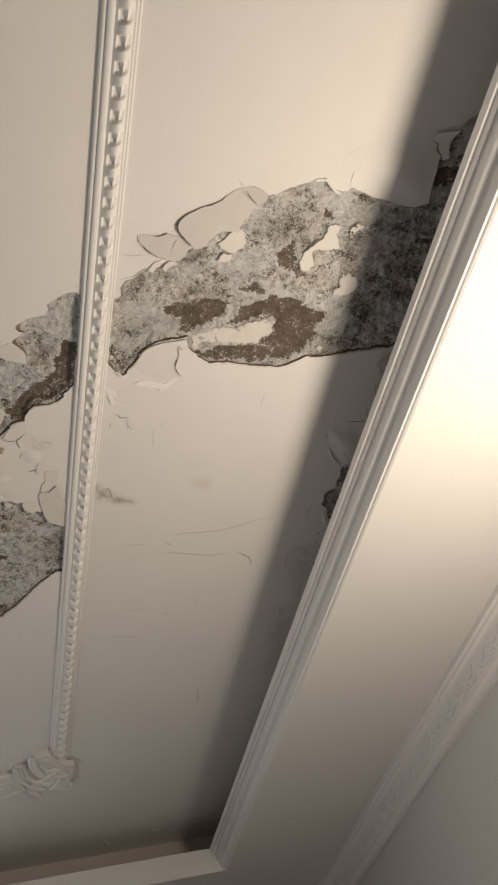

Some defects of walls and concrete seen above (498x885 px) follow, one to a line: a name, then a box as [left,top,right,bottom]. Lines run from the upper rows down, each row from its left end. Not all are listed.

spalling [108,113,479,392]
spalling [0,292,81,460]
spalling [0,486,67,618]
spalling [322,463,351,519]